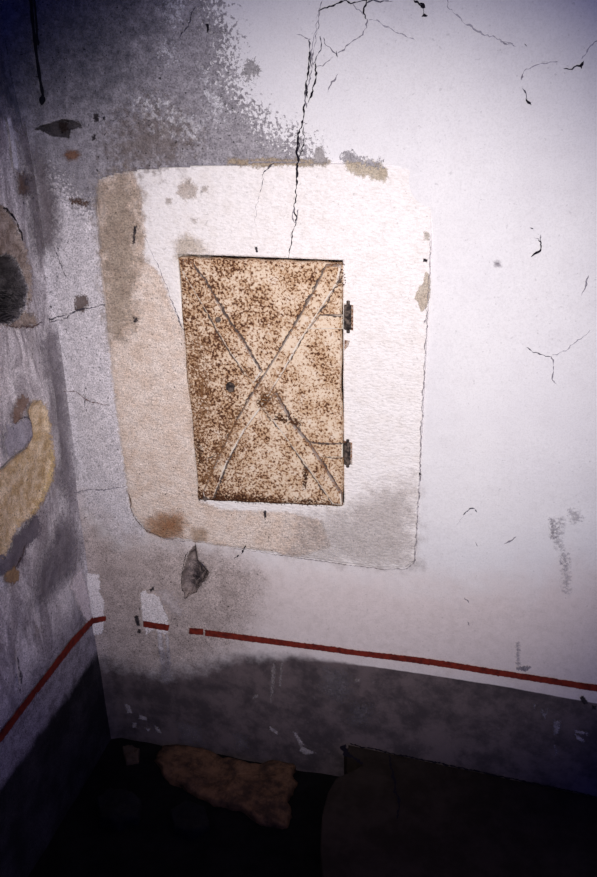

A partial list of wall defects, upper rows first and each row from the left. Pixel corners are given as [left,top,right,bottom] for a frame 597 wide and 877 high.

crack [414,0,428,17]
damp [241,56,261,82]
crack [447,0,597,104]
crack [288,0,414,259]
damp [7,118,58,263]
damp [167,180,207,203]
damp [228,147,387,182]
damp [176,235,203,257]
peeling [11,0,330,599]
crack [527,330,590,384]
rust [184,332,331,506]